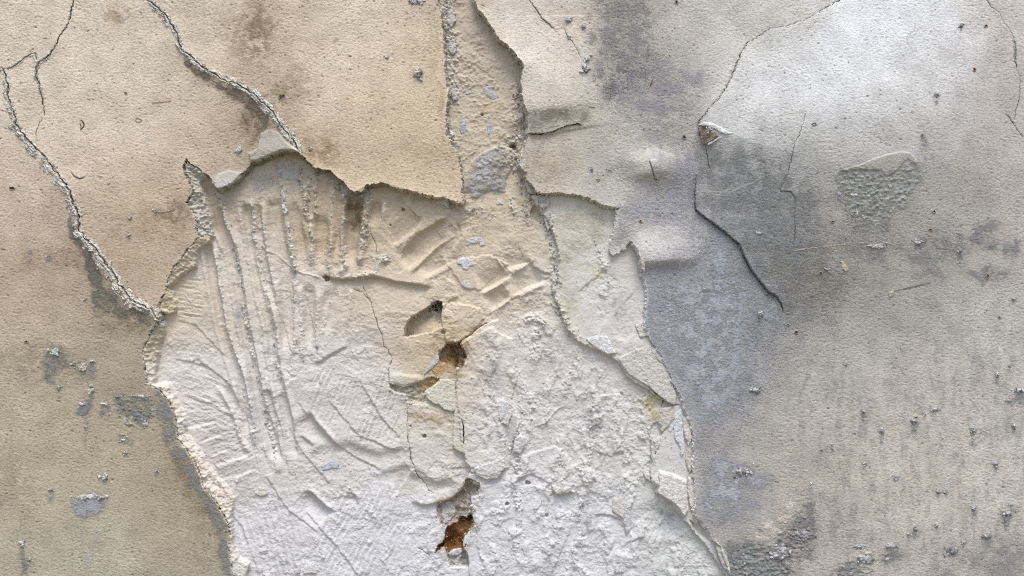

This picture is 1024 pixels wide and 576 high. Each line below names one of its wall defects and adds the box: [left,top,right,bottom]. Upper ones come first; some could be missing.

crack [147,0,303,155]
crack [697,0,840,126]
crack [988,2,1021,135]
crack [0,1,167,327]
flaking render [142,0,731,576]
crack [694,179,783,311]
crack [780,114,806,250]
peeling [835,161,922,235]
corrosion [421,341,468,391]
corrosion [436,480,477,552]